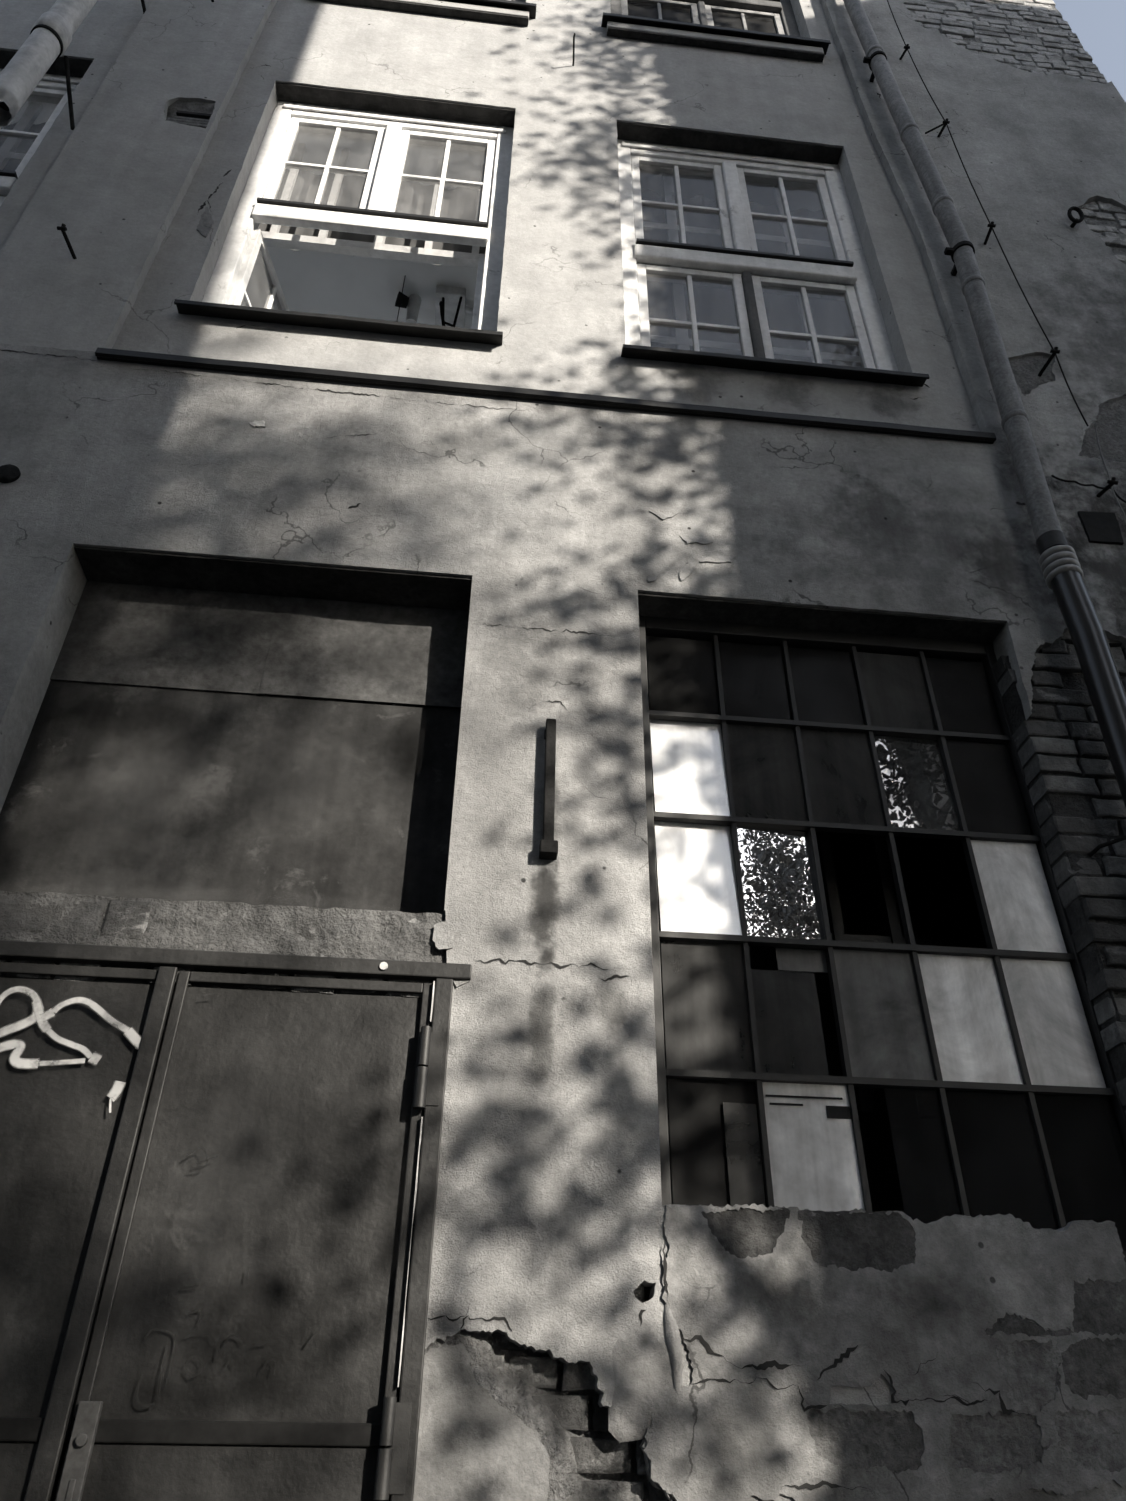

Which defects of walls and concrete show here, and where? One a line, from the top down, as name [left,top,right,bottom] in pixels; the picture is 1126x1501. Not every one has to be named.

spalling [904,0,1108,84]
spalling [1079,201,1126,265]
peeling [679,534,735,582]
spalling [992,631,1126,1115]
peeling [432,919,454,950]
peeling [765,1094,852,1119]
spalling [701,1206,916,1272]
spalling [633,1284,652,1303]
spalling [985,1279,1126,1400]
spalling [413,1330,669,1501]
spalling [807,1407,924,1472]
spalling [949,1411,1043,1475]